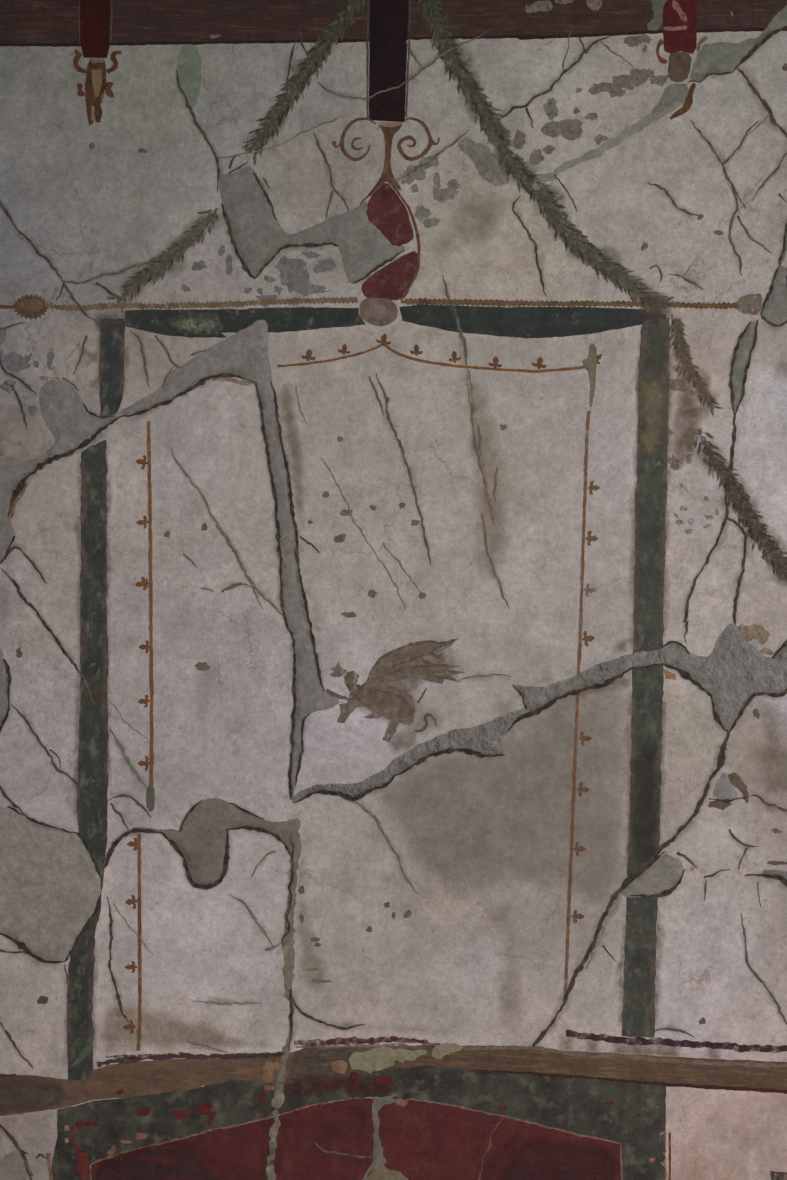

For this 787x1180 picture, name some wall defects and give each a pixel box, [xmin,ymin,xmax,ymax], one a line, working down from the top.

peeling [400,155,460,228]
peeling [457,137,510,187]
crack [397,32,634,181]
peeling [513,98,609,165]
peeling [576,68,669,98]
peeling [244,251,336,308]
crack [0,27,510,1022]
crack [460,26,787,1046]
peeling [737,624,773,655]
peeling [708,772,749,810]
crack [0,1022,33,1068]
crack [288,986,365,1052]